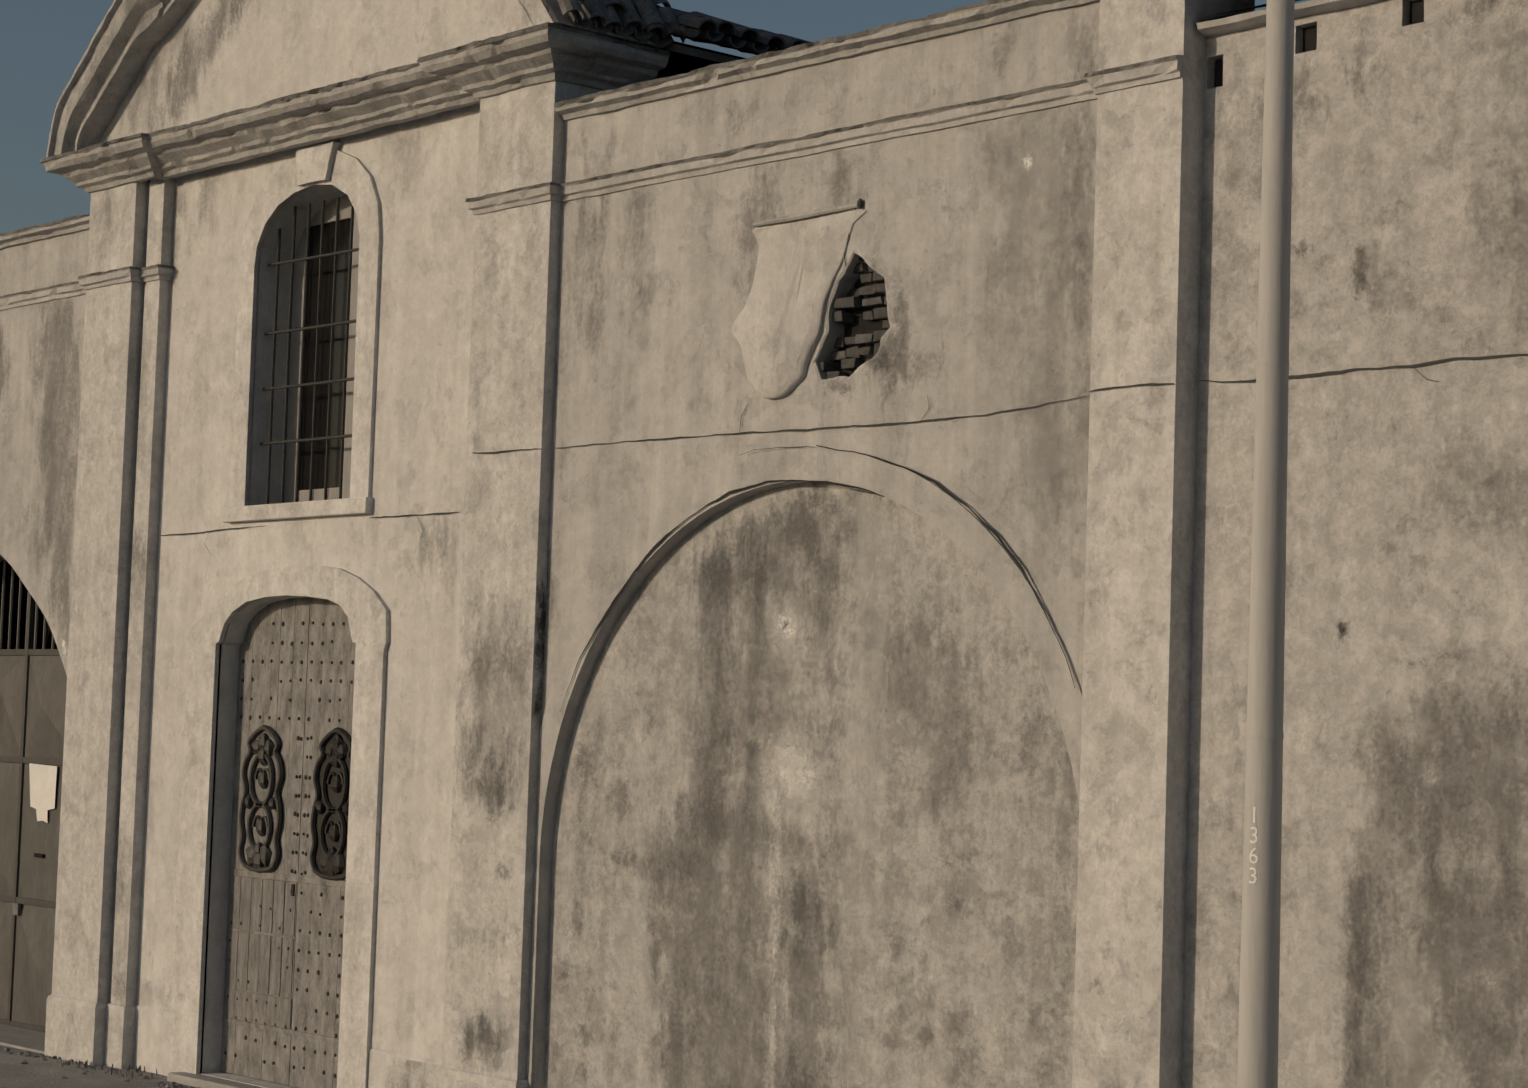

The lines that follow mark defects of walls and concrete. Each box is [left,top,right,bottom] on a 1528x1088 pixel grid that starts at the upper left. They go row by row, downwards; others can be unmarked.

flaking render [809,244,894,385]
water stain [770,788,782,1088]